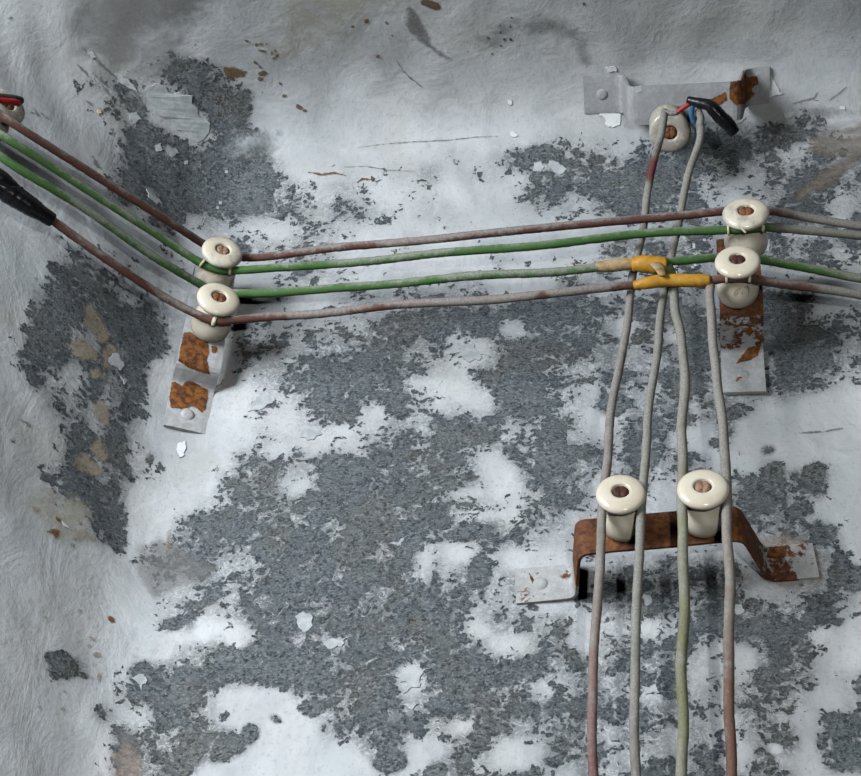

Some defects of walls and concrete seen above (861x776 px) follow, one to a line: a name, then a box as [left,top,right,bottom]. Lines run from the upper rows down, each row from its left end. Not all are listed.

rust [420,0,440,11]
water stain [76,0,195,70]
rust [711,71,759,105]
peeling [599,113,621,128]
peeling [73,51,267,237]
water stain [495,109,861,280]
rust [178,332,217,374]
rust [736,326,762,364]
rust [169,381,208,412]
peeling [176,441,186,458]
water stain [9,235,861,776]
rust [763,536,804,560]